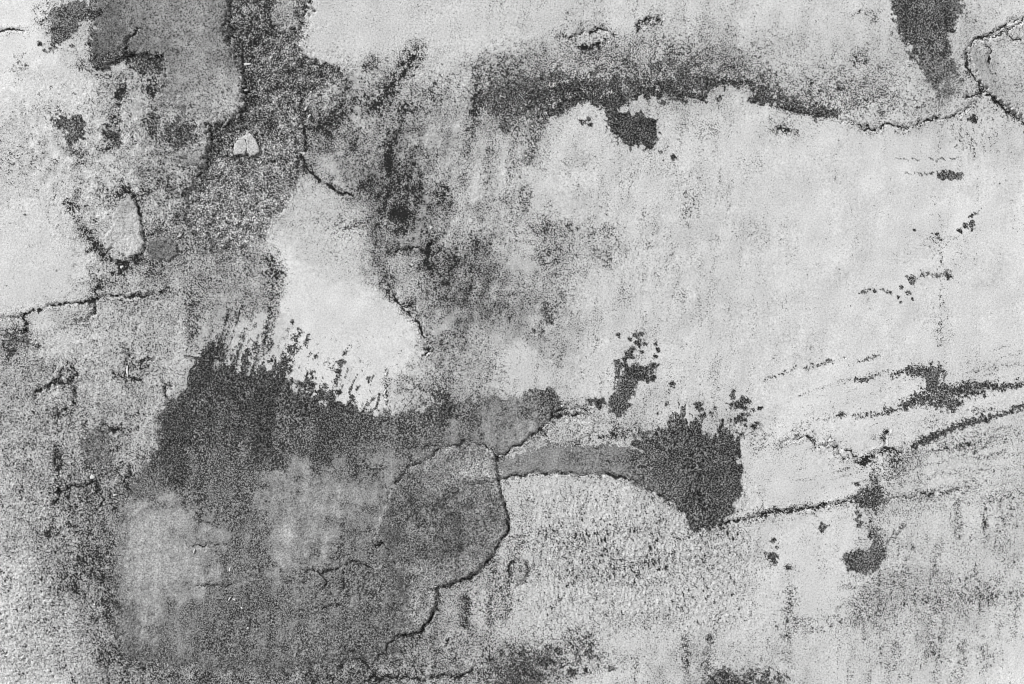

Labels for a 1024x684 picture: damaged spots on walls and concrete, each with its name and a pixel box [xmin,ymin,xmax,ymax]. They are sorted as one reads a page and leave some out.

water stain [37,0,103,53]
water stain [470,38,850,170]
crack [779,17,1024,131]
water stain [891,0,978,124]
crack [124,191,145,240]
crack [14,288,160,325]
water stain [887,361,948,400]
water stain [111,319,763,684]
crack [342,405,860,682]
water stain [768,538,791,570]
water stain [841,468,906,576]
water stain [702,634,791,684]